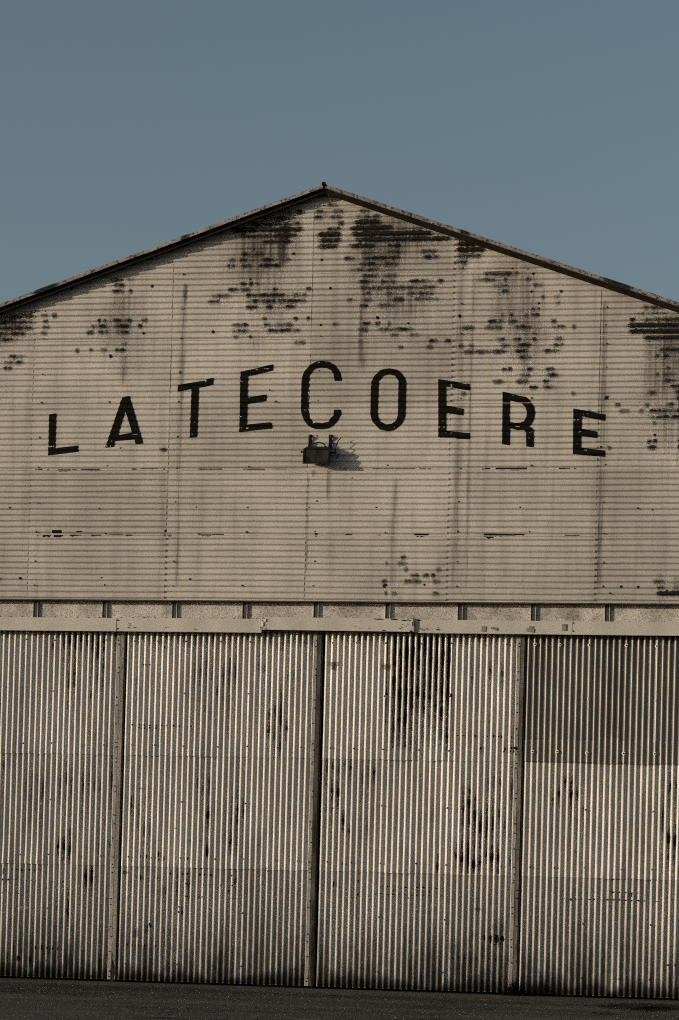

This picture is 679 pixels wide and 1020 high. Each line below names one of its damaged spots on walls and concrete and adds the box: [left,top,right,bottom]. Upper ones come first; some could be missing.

rust [392,636,451,748]
rust [455,789,511,874]
rust [662,809,676,865]